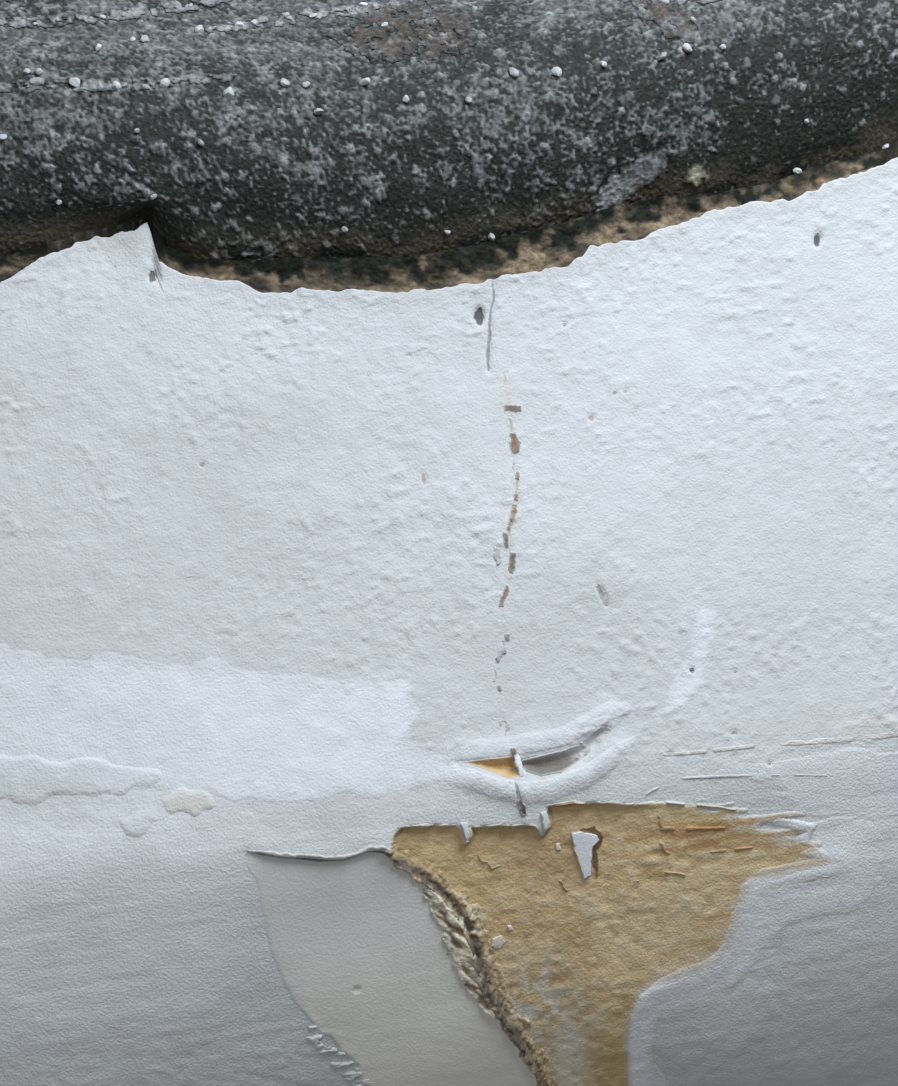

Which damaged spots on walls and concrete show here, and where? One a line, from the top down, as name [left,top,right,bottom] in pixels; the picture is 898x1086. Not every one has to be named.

crack [485,279,523,691]
crack [499,720,527,816]
spalling [246,793,887,1086]